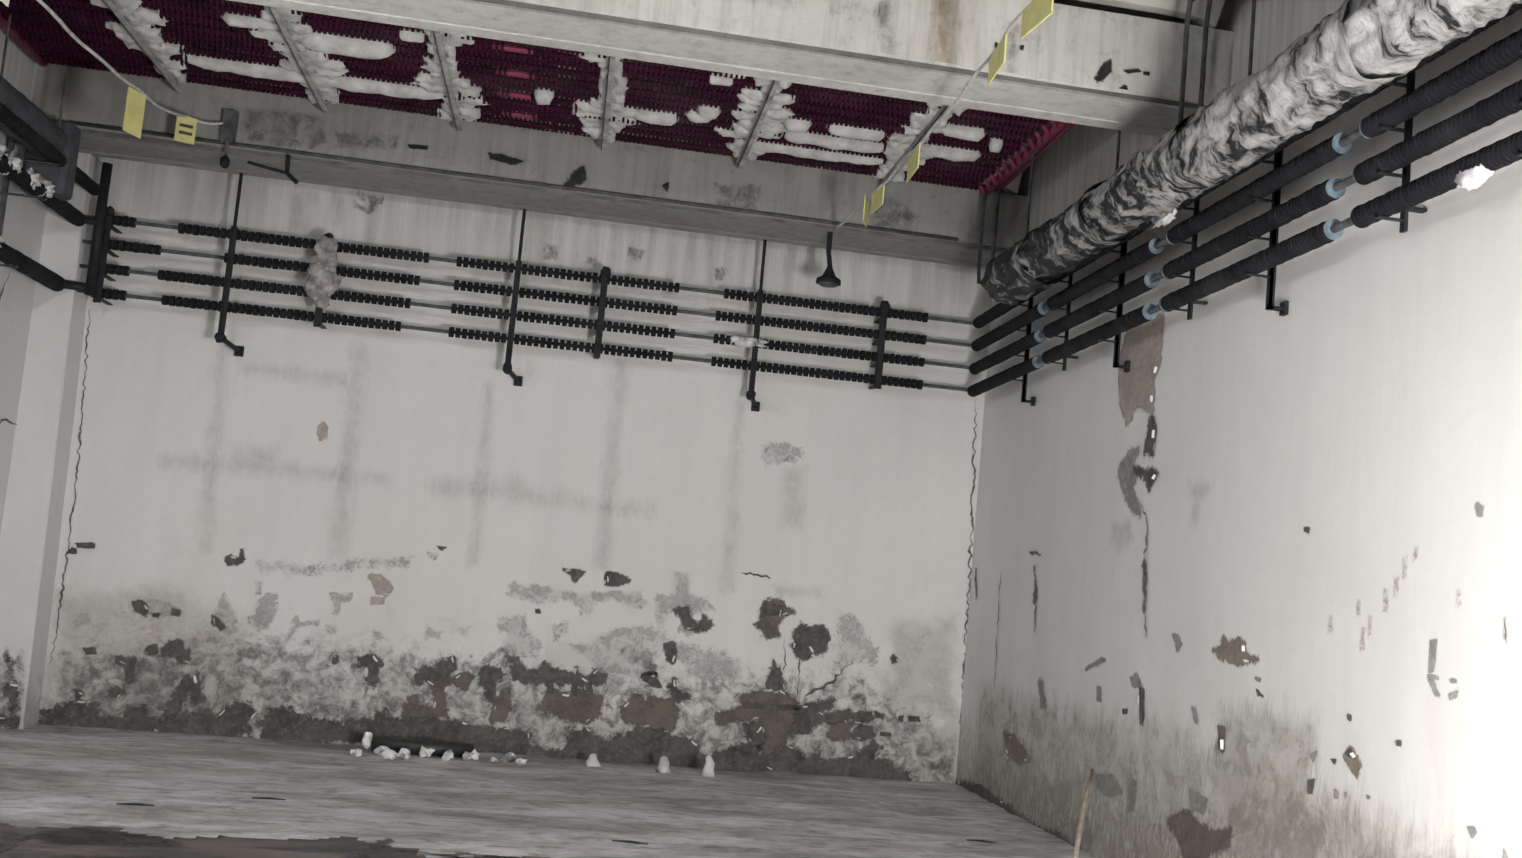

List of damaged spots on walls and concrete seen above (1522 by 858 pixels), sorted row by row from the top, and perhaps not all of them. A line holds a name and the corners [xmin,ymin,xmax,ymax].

peeling [1118,314,1165,519]
peeling [66,542,96,554]
peeling [224,548,258,567]
damp [72,639,573,752]
peeling [38,568,921,781]
damp [681,676,766,752]
damp [787,683,952,781]
peeling [931,761,1092,852]
spalling [1167,788,1233,858]
peeling [1217,725,1226,753]
peeling [1212,634,1264,698]
peeling [1307,746,1362,799]